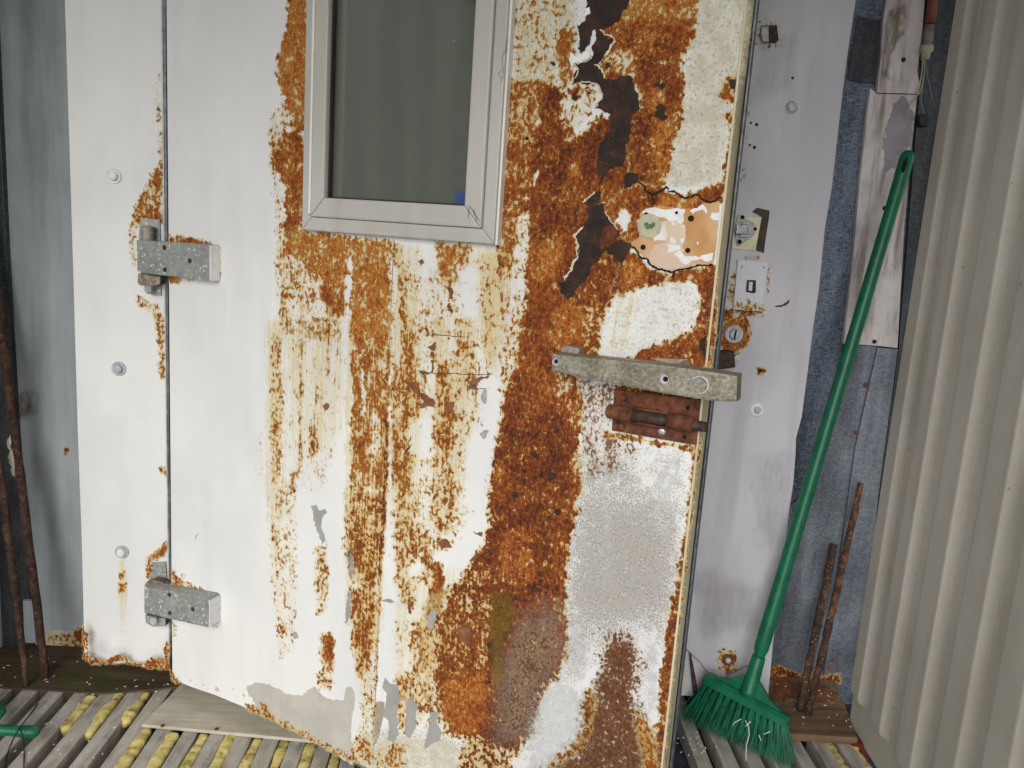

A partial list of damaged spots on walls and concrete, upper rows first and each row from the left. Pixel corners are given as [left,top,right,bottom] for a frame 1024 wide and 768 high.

crack [638,181,722,206]
crack [631,246,713,278]
peeling [631,201,719,270]
corrosion [137,295,165,380]
corrosion [245,0,770,768]
peeling [311,505,327,544]
corrosion [169,571,204,590]
corrosion [47,623,181,684]
corrosion [768,664,843,705]
peeling [243,683,355,765]